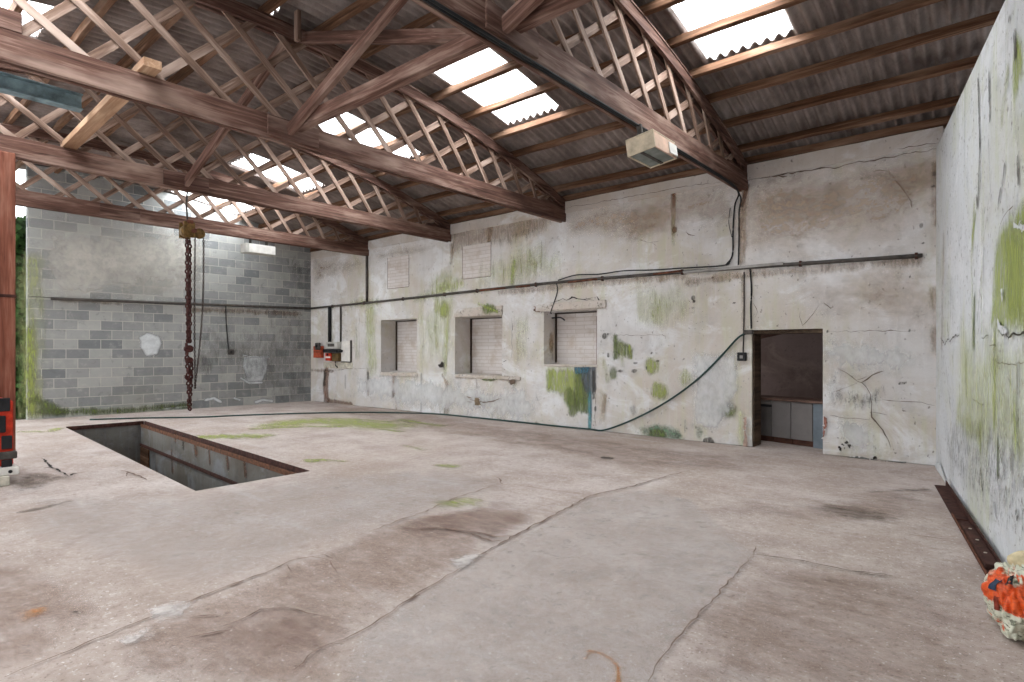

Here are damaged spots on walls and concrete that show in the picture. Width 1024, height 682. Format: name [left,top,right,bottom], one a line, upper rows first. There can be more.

crack [751,143,935,207]
damp [602,333,637,373]
damp [565,367,595,428]
crack [831,368,935,444]
damp [950,359,1021,520]
crack [293,468,697,670]
crack [648,547,891,681]